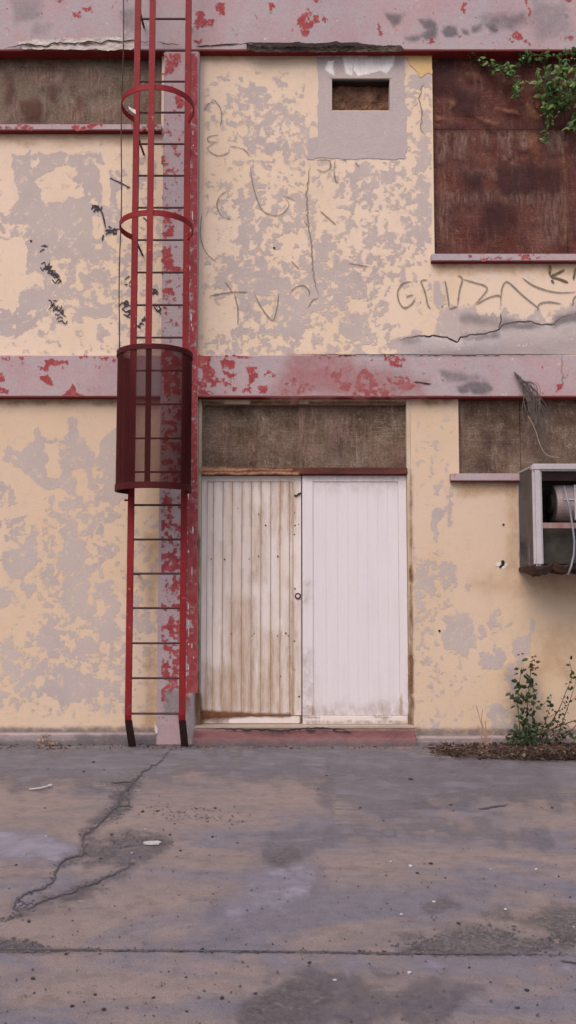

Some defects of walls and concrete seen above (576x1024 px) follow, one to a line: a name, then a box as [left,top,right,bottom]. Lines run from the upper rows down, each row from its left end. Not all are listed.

peeling [0,0,576,733]
crack [296,312,575,388]
corrosion [195,673,294,725]
crack [18,862,133,909]